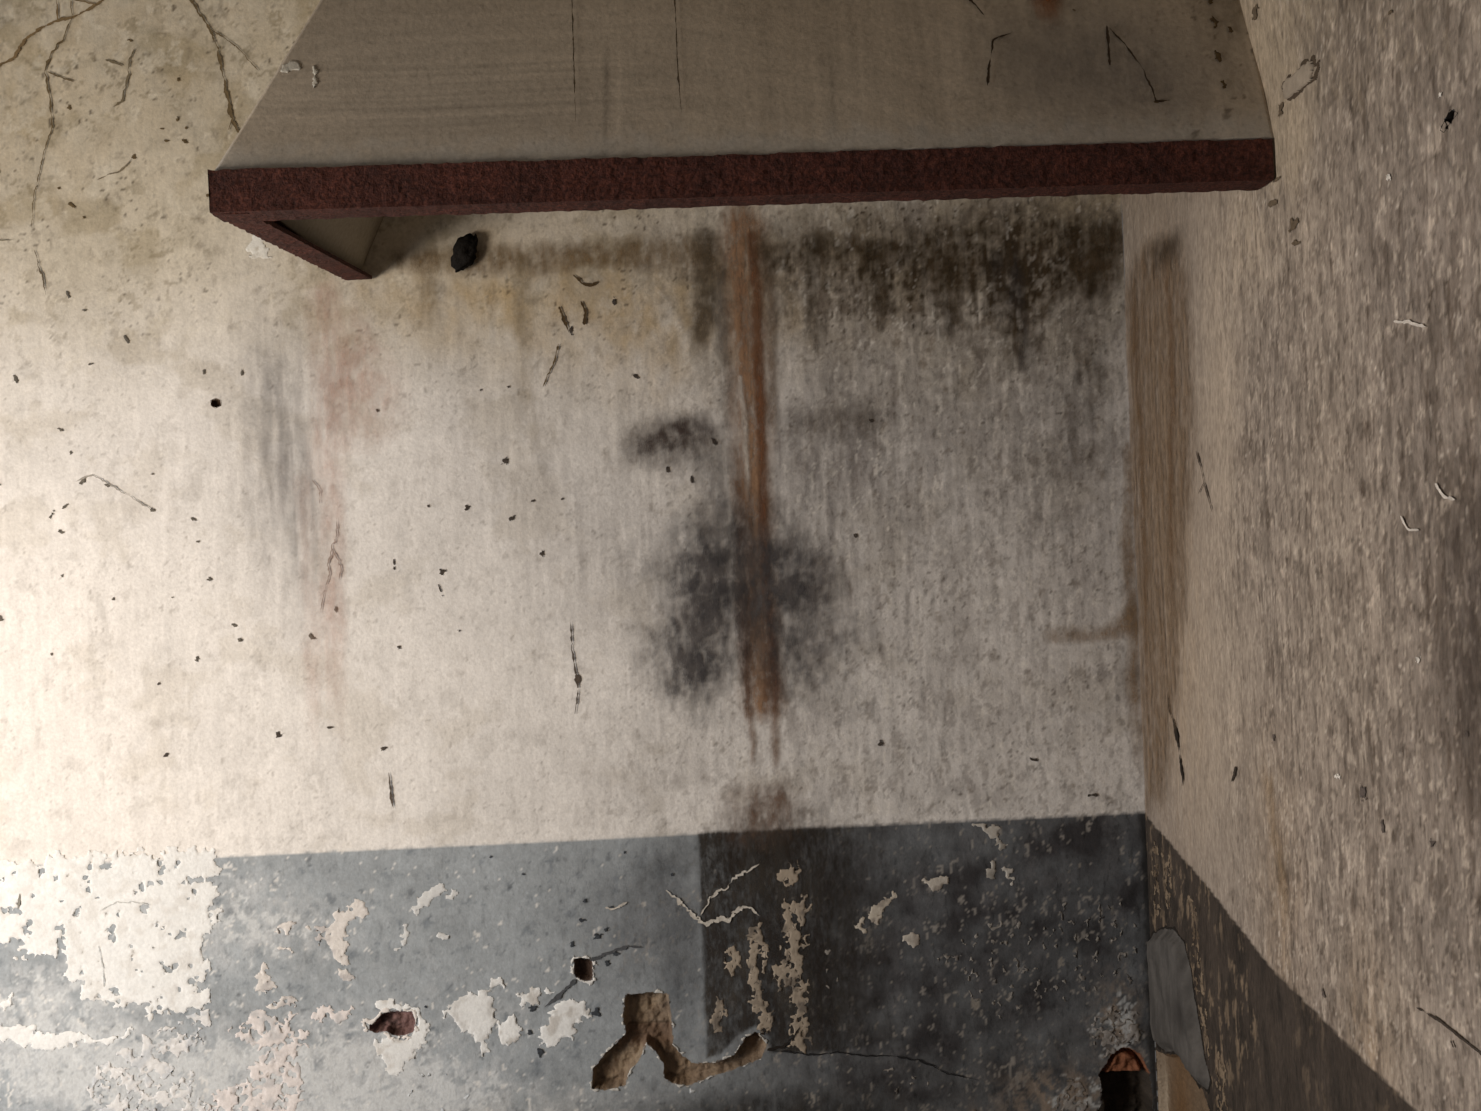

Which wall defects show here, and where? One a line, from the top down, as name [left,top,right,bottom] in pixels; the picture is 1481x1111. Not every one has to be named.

crack [106,48,135,106]
crack [189,0,257,133]
crack [0,0,103,293]
damp [472,233,725,358]
damp [738,376,749,479]
corrosion [724,207,781,759]
corrosion [748,790,790,829]
peeling [0,845,620,1111]
flaking render [589,860,838,1093]
peeling [902,932,920,948]
peeling [922,876,949,891]
flaking render [1052,842,1228,1111]